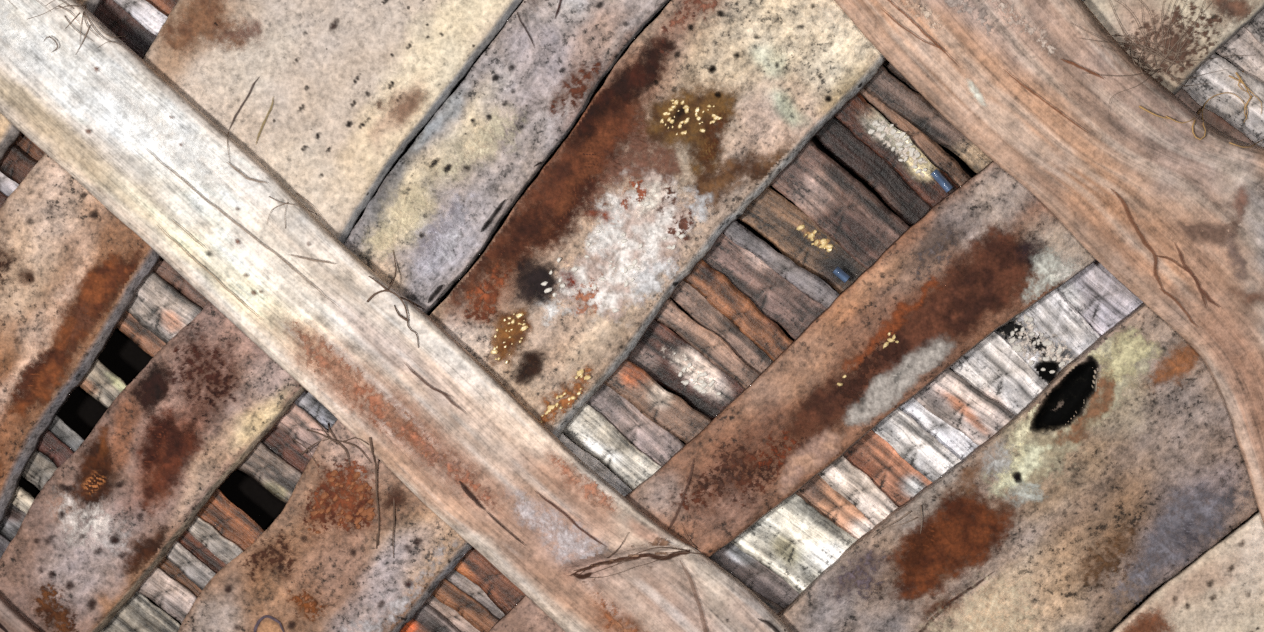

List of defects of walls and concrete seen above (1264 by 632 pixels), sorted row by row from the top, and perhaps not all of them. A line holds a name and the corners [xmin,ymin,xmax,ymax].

leakage [452,0,783,325]
rust [13,254,139,414]
rust [464,265,512,323]
rust [788,228,1042,440]
crack [1110,188,1220,328]